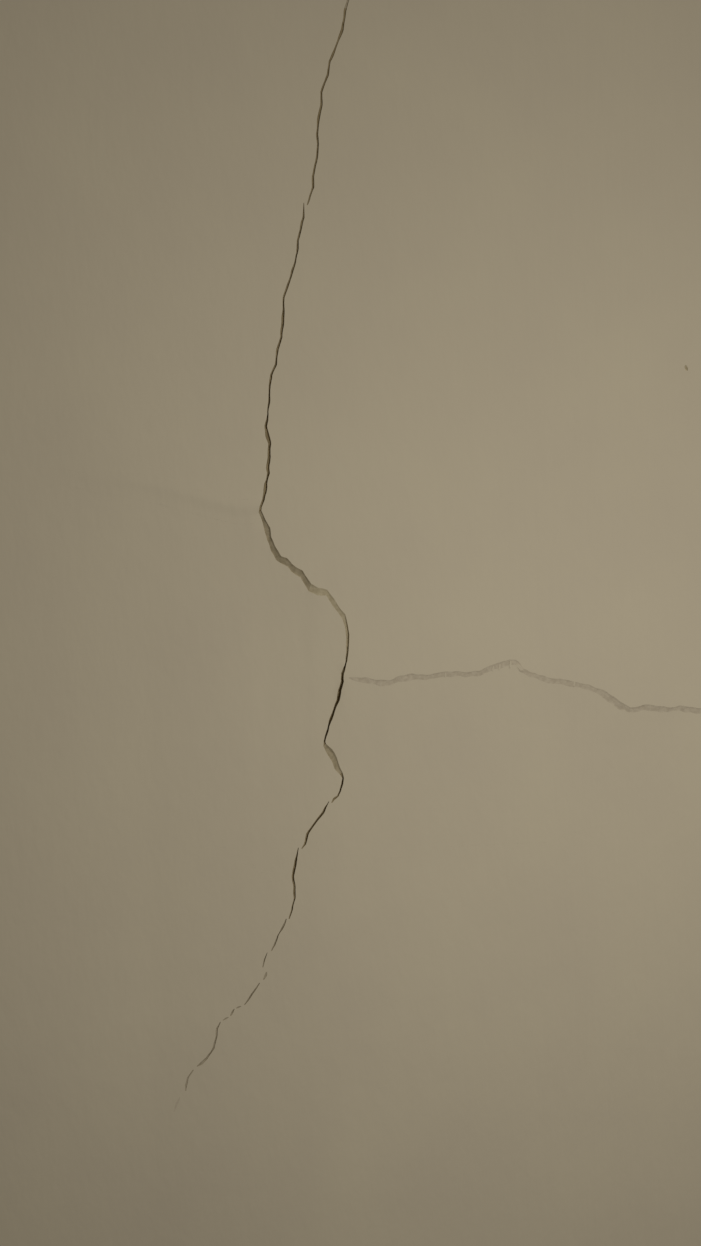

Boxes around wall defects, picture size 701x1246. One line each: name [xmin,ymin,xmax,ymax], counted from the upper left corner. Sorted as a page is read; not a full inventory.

crack [174,0,701,1112]